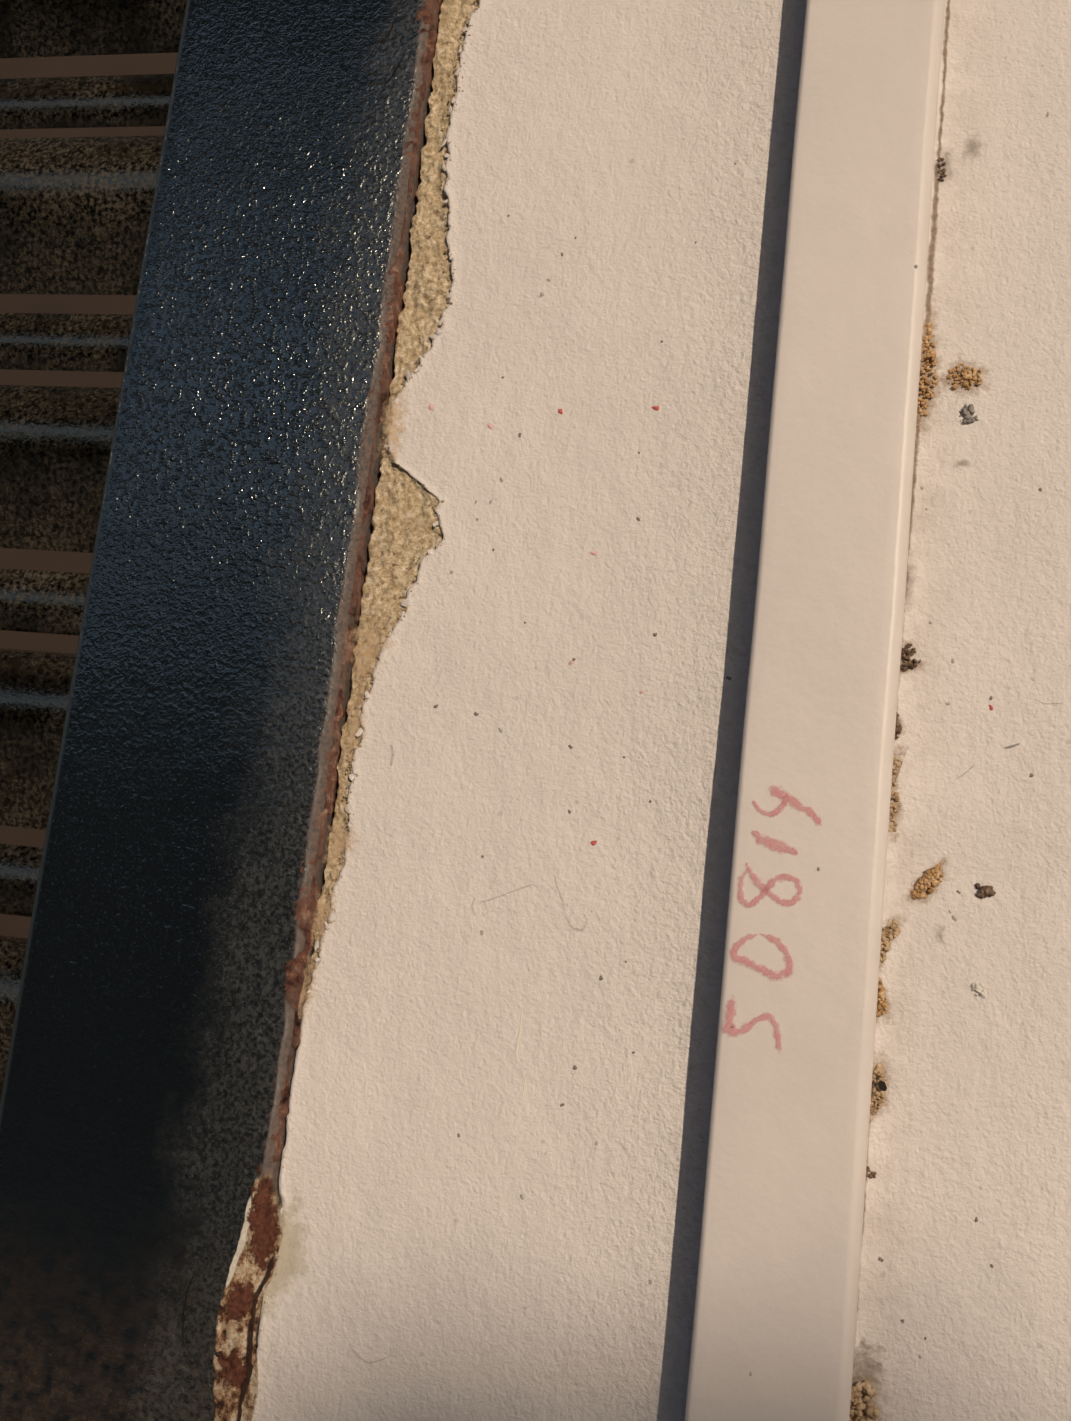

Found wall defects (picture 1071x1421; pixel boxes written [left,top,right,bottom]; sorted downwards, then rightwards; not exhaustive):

rust [225,0,443,1325]
spalling [307,0,480,994]
rust [218,1349,251,1394]